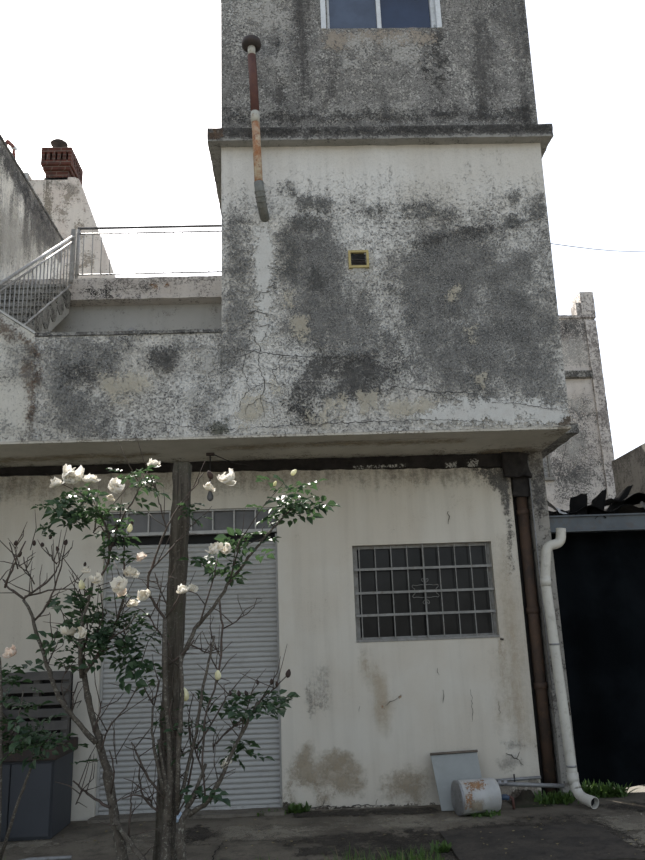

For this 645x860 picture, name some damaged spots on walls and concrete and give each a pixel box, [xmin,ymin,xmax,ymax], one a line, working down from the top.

water stain [223,0,551,137]
water stain [0,181,586,440]
crack [137,291,552,443]
water stain [296,747,361,791]
water stain [183,774,645,860]